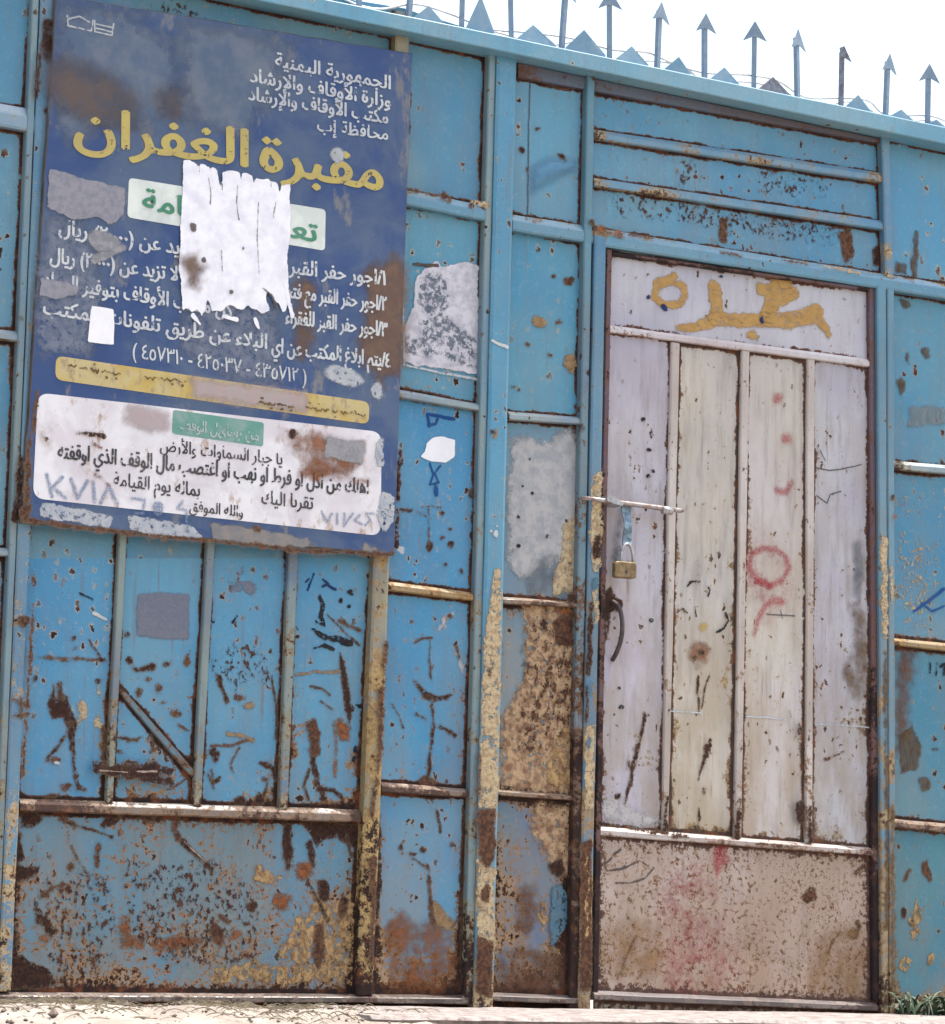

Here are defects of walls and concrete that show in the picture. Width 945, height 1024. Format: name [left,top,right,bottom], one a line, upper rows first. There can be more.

rust [616,194,861,275]
rust [11,391,405,557]
peeling [588,468,604,624]
rust [11,603,96,778]
rust [44,682,86,798]
rust [92,734,176,788]
rust [11,811,259,990]
rust [282,821,358,871]
rust [295,640,497,990]
peeling [476,516,575,962]
rust [517,592,594,754]
rust [883,649,937,997]